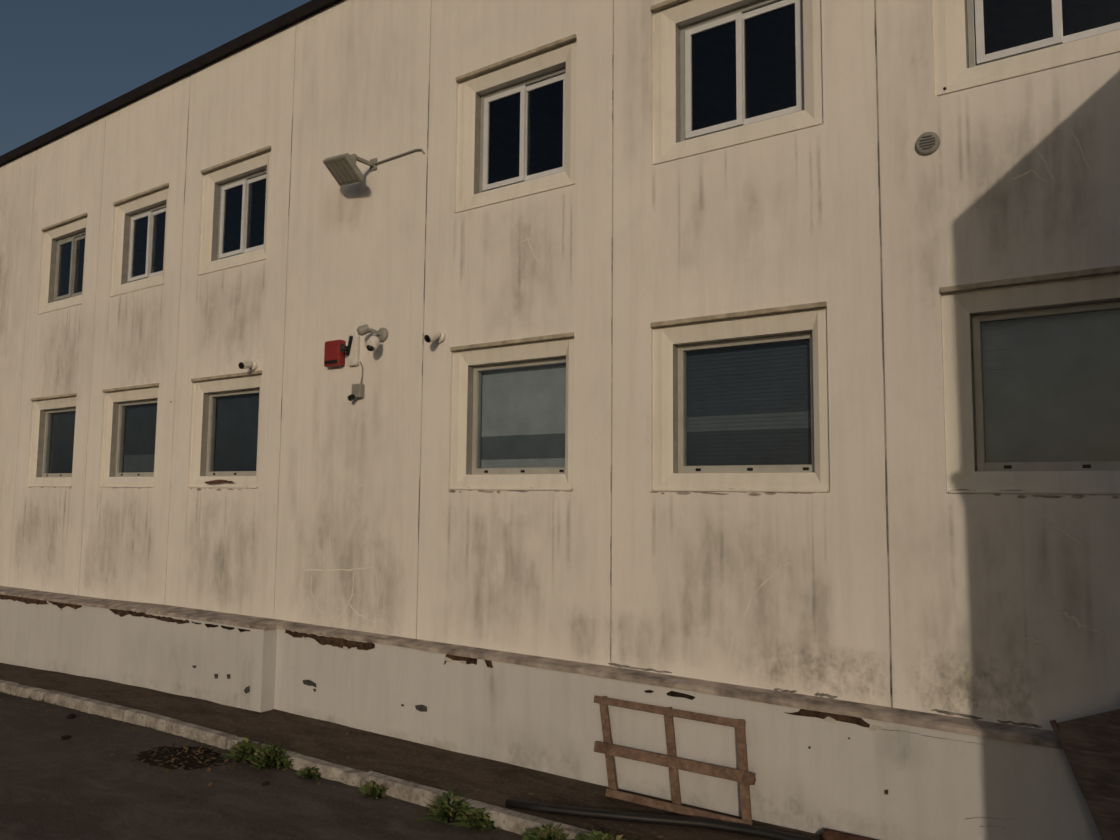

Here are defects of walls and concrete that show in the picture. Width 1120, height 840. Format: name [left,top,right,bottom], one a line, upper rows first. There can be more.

flaking render [109,609,250,632]
flaking render [284,630,375,650]
flaking render [444,654,493,668]
flaking render [787,709,884,733]